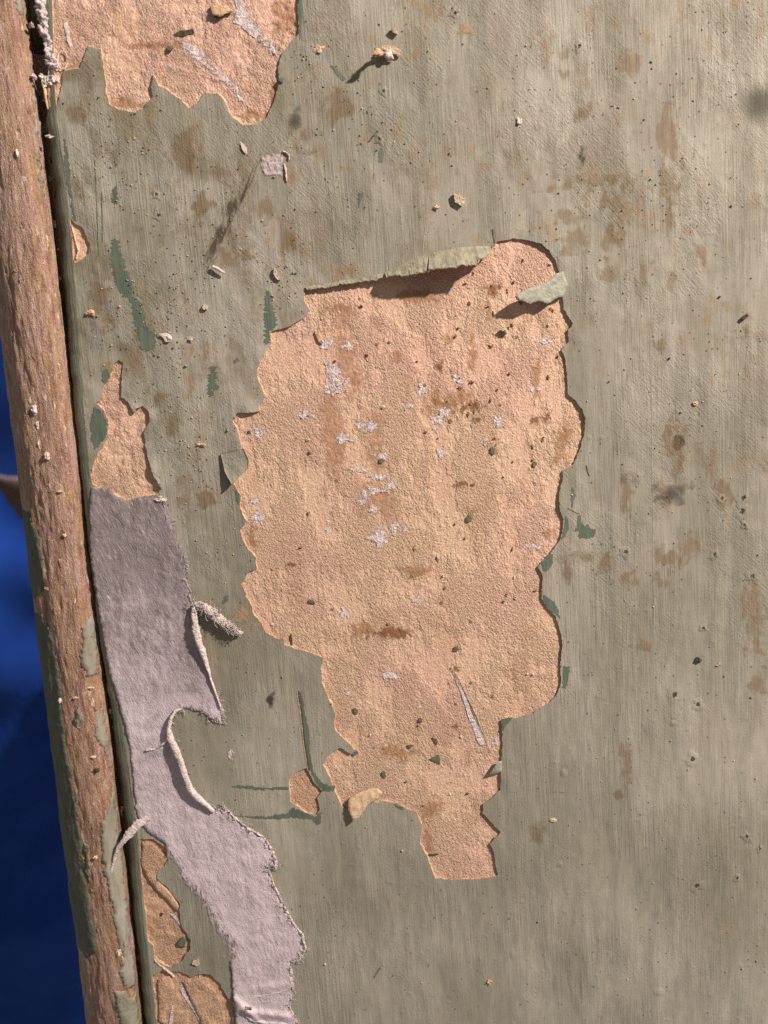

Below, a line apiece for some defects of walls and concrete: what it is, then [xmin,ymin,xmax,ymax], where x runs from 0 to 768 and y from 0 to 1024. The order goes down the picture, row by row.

peeling [29,0,299,124]
peeling [91,360,161,500]
peeling [221,238,585,879]
peeling [140,839,233,1024]